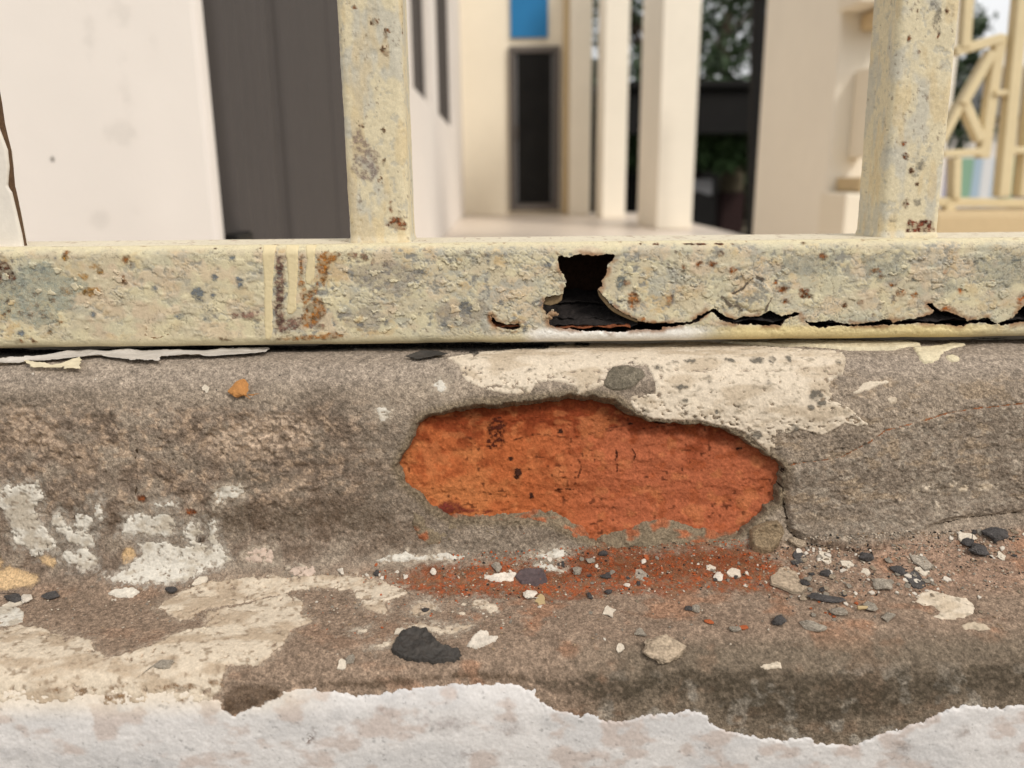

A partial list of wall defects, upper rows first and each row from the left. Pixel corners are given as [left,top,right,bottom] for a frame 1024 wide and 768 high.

rust [275,252,367,340]
rust [906,220,934,232]
crack [776,403,1024,552]
peeling [0,338,1024,768]